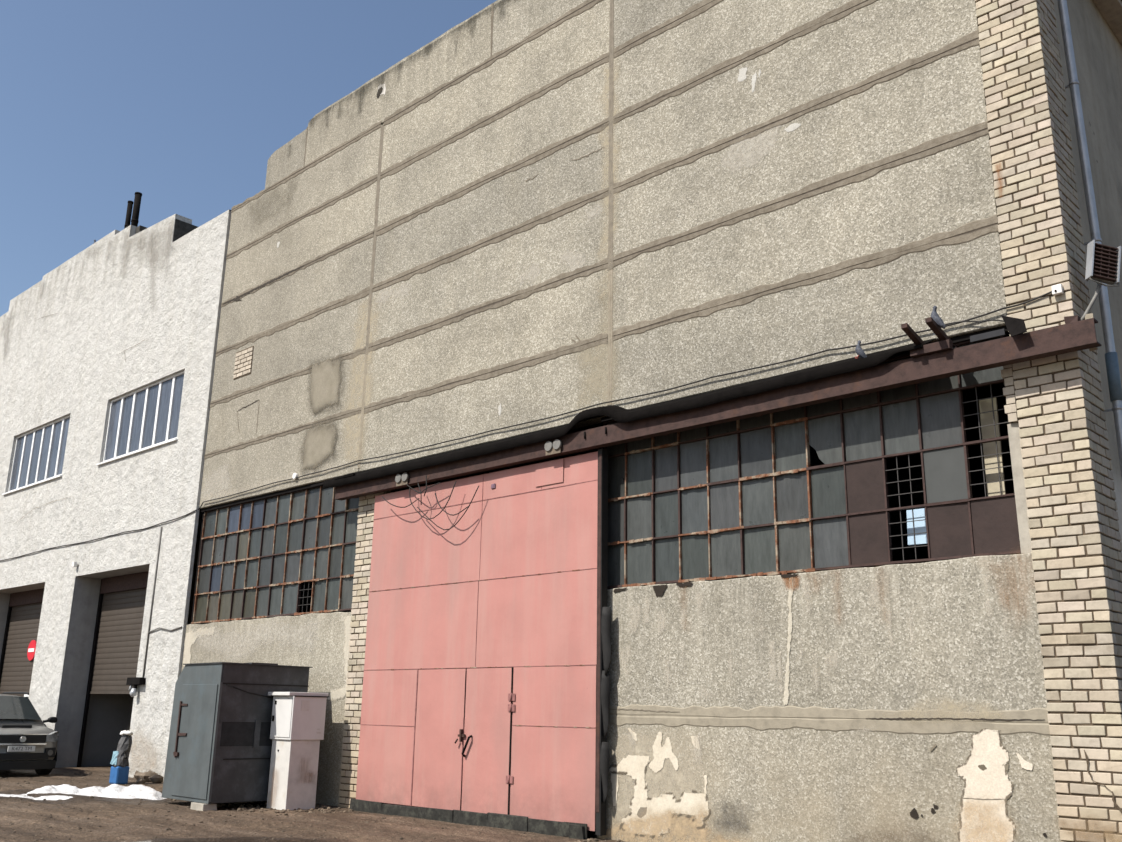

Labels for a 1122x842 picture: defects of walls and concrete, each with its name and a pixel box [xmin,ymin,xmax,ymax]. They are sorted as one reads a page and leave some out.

damp [771,578,794,705]
peeling [609,728,711,838]
peeling [956,728,1033,842]